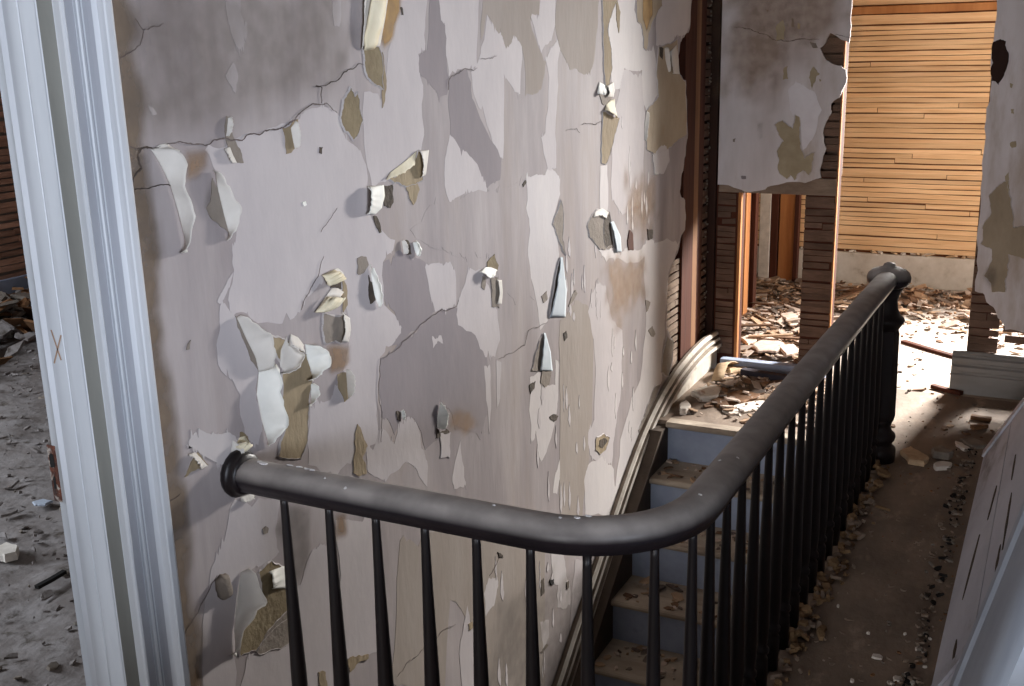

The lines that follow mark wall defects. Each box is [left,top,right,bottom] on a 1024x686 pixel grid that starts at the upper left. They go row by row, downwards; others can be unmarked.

crack [119,18,161,59]
crack [129,63,363,190]
flaking render [774,66,822,181]
flaking render [991,39,1013,88]
peeling [151,0,691,516]
flaking render [980,172,1024,293]
crack [378,301,459,435]
peeling [202,494,377,686]
peeling [392,531,582,686]